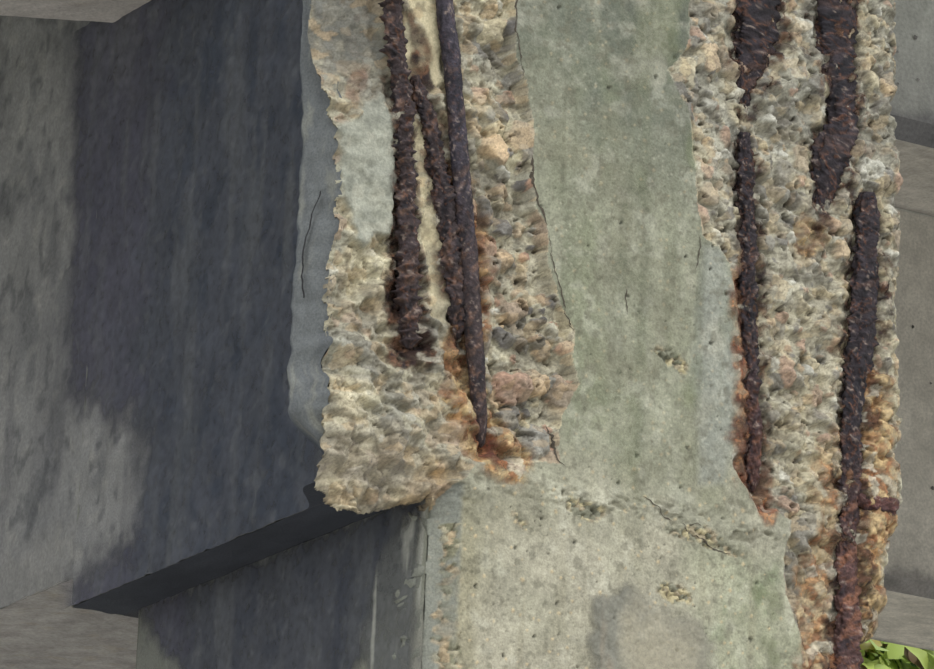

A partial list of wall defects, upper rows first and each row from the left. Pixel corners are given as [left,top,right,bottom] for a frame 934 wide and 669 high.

crack [301,191,321,298]
spalling [307,0,483,514]
rust [390,89,441,223]
rust [407,7,440,112]
rust [384,148,531,482]
spalling [453,0,580,463]
damp [590,585,714,669]
rust [729,130,777,524]
rust [724,0,798,121]
spalling [668,0,903,669]
rust [797,160,858,285]
rust [794,298,900,669]